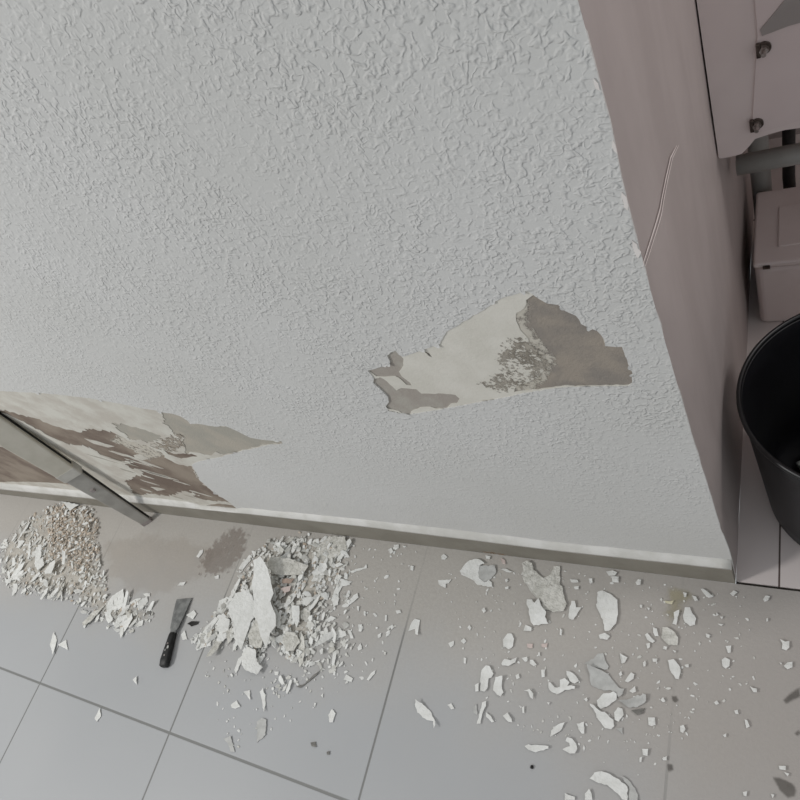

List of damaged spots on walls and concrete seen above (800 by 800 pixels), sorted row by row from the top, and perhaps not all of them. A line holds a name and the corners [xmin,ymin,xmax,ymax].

peeling [369,291,634,416]
peeling [0,391,283,508]